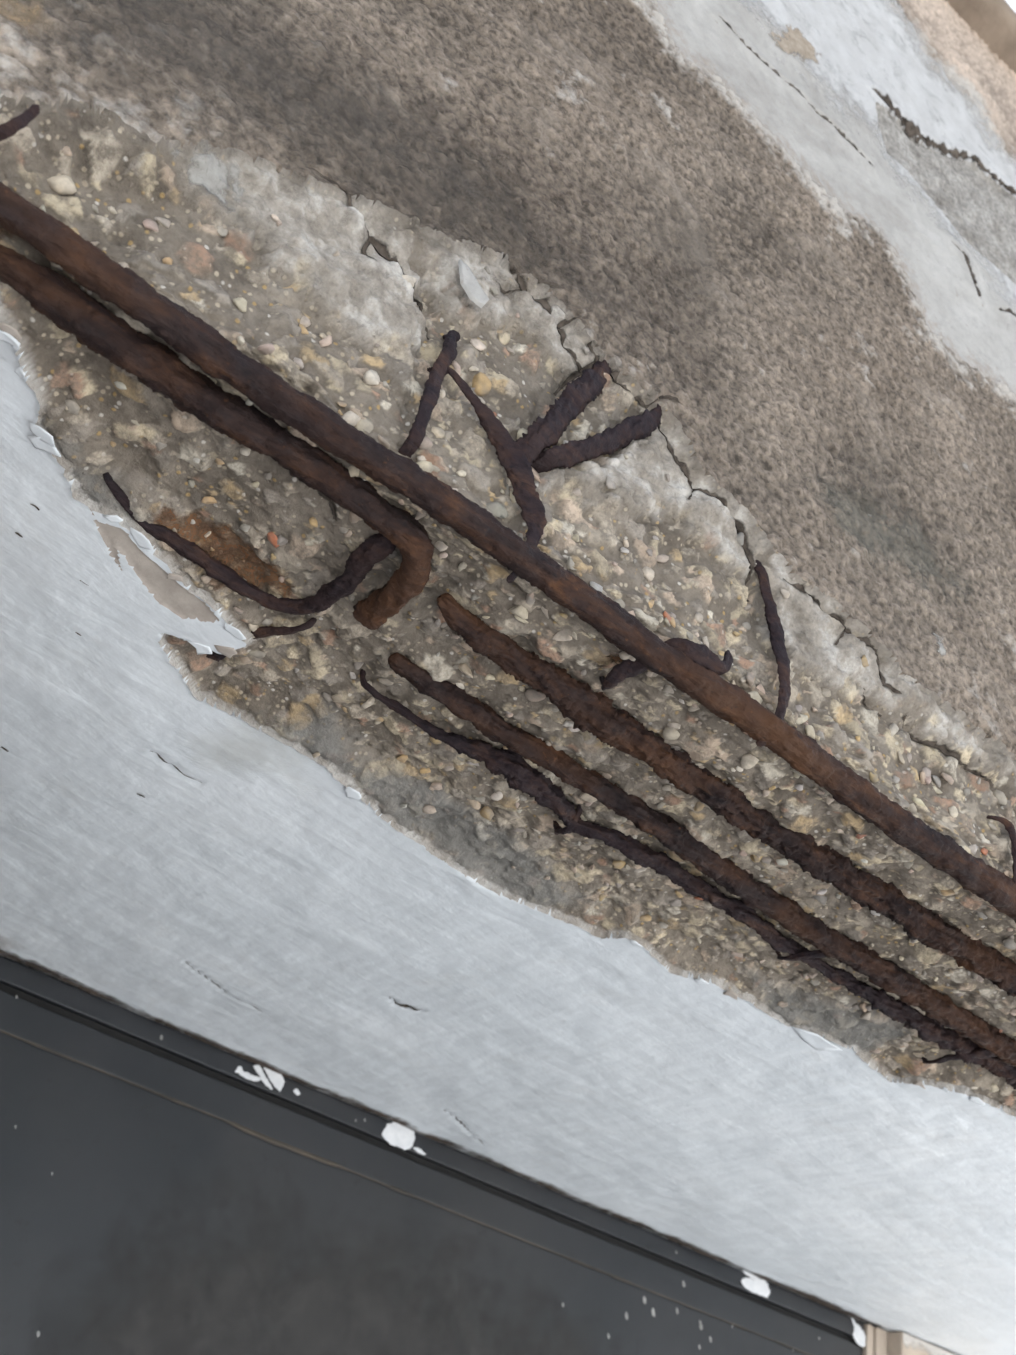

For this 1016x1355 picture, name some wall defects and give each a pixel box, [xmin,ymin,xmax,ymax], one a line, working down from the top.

corrosion [0,104,40,142]
crack [719,16,873,166]
peeling [656,0,1016,396]
corrosion [0,181,1016,997]
spalling [0,93,1016,1117]
corrosion [360,652,1016,1090]